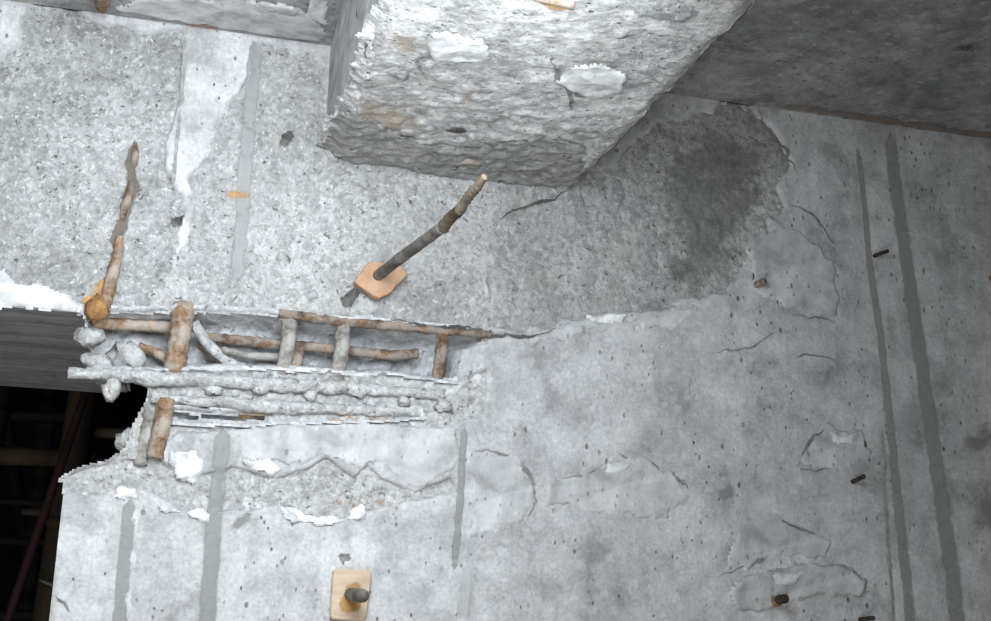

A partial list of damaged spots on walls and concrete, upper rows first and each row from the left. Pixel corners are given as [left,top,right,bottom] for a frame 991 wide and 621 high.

crack [758,110,797,172]
damp [669,138,757,278]
crack [792,205,836,246]
spalling [0,0,840,537]
rust [82,280,116,303]
crack [714,333,772,353]
crack [797,429,826,472]
crack [769,514,815,535]
crack [722,551,784,575]
rust [340,583,360,612]